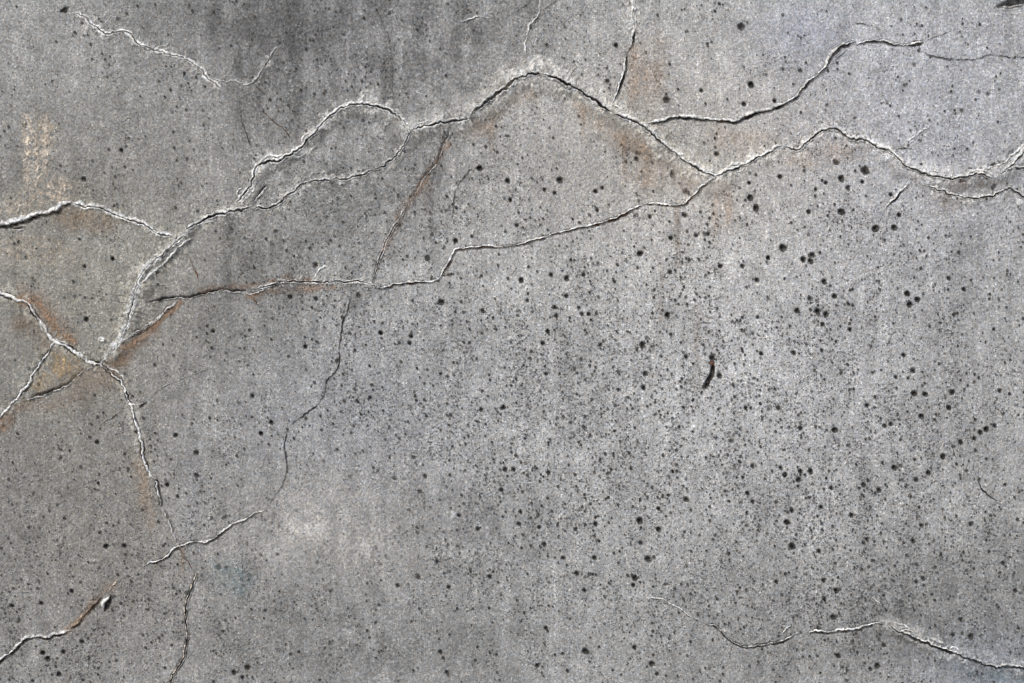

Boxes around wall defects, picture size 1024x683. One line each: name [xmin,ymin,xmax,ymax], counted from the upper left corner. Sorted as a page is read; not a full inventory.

crack [60,7,279,95]
crack [626,0,643,51]
crack [0,39,1024,569]
crack [0,581,117,663]
crack [170,572,197,683]
crack [650,597,1024,679]